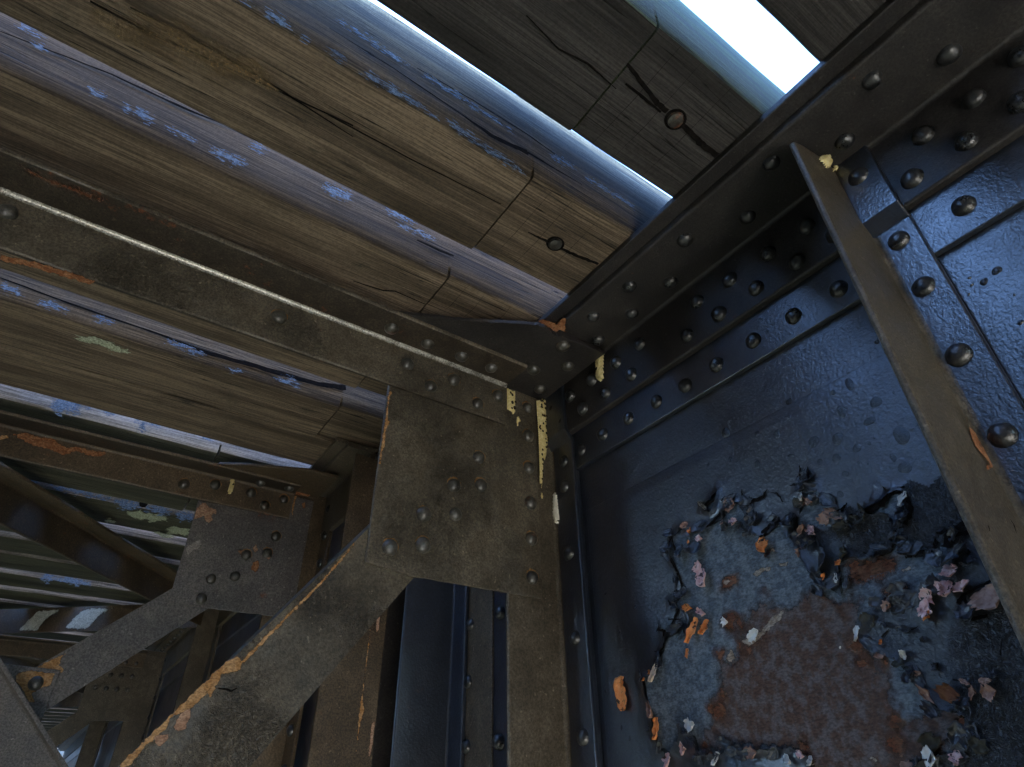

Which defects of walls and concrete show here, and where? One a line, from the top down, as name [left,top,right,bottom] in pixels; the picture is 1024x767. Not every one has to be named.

corrosion [0,255,95,285]
corrosion [538,318,567,332]
corrosion [0,433,106,457]
corrosion [969,427,993,470]
corrosion [194,503,216,523]
peeling [586,354,1024,767]
corrosion [120,543,355,767]
corrosion [15,654,65,702]